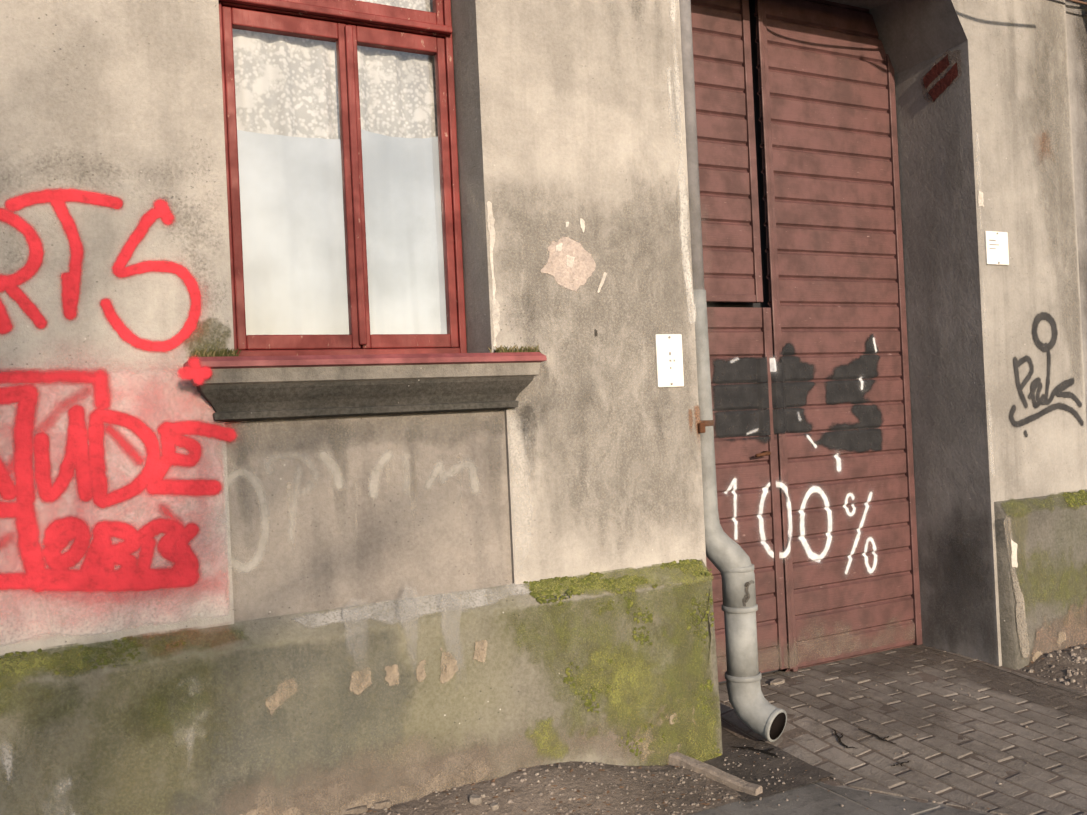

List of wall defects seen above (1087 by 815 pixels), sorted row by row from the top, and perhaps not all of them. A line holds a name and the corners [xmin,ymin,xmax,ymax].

flaking render [541,218,596,291]
flaking render [265,679,295,715]
flaking render [349,672,372,695]
flaking render [385,664,400,686]
flaking render [440,648,458,683]